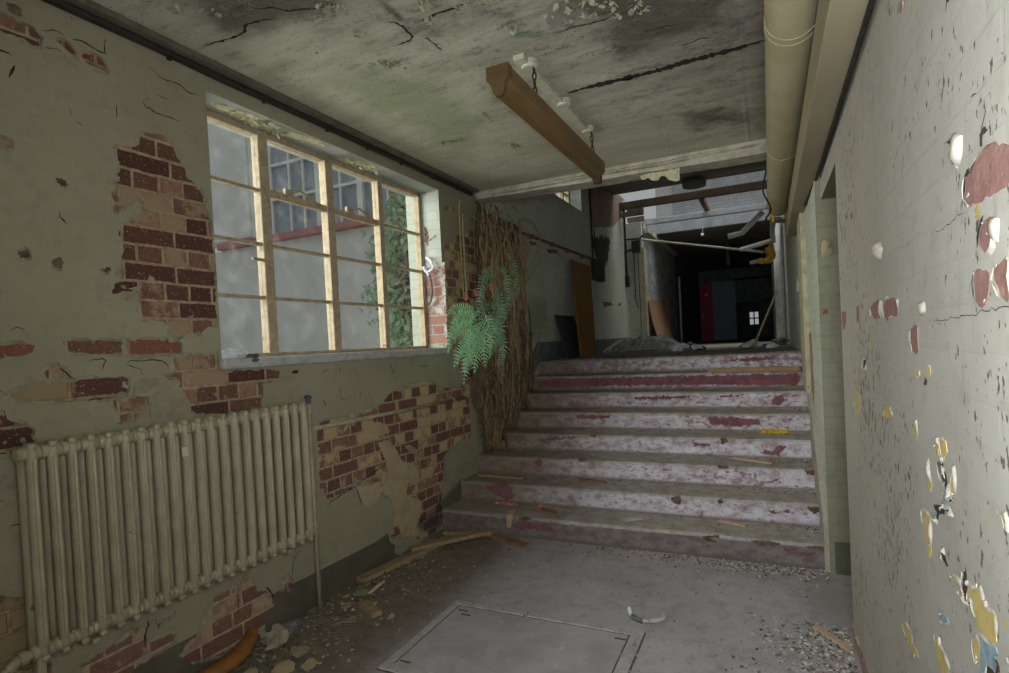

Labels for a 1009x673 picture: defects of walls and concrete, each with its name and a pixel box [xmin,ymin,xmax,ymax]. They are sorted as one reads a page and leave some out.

crack [204,4,336,47]
crack [557,16,612,34]
damp [616,0,715,49]
crack [568,25,765,93]
flaking render [944,127,1009,210]
flaking render [60,130,280,417]
crack [929,274,1009,325]
flaking render [973,216,1009,307]
flaking render [0,362,149,455]
flaking render [316,230,479,543]
peeling [920,436,1009,673]
flaking render [76,568,274,673]